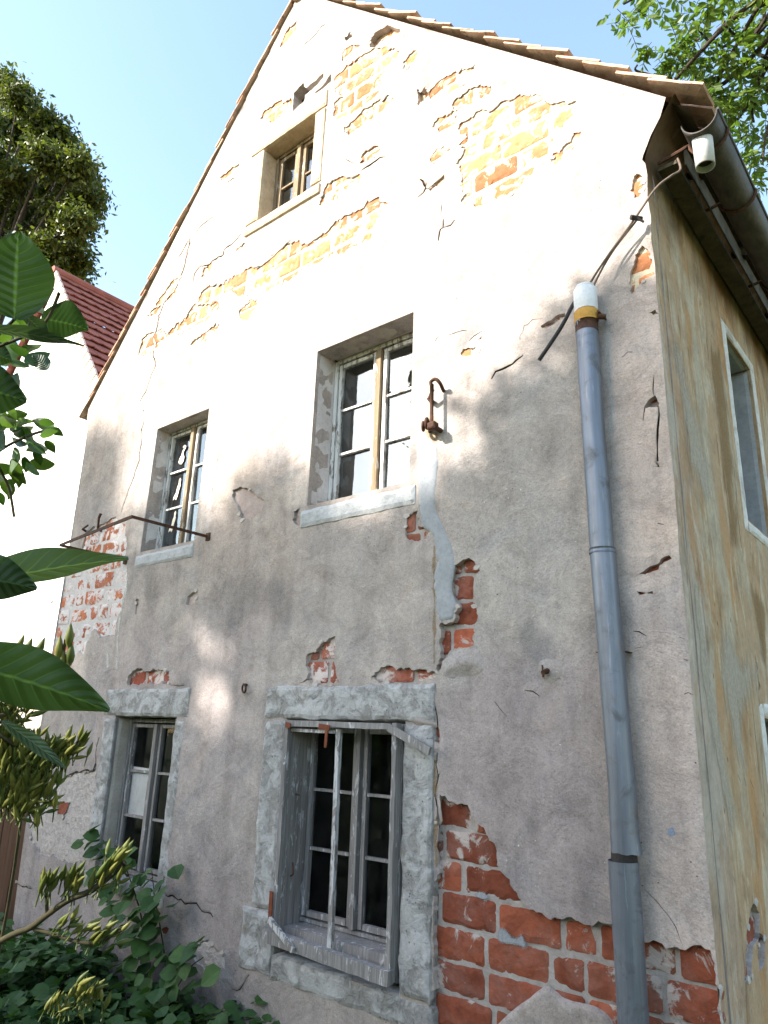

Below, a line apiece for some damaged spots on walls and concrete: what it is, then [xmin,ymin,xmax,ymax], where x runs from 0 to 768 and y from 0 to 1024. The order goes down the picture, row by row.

flaking render [259,25,418,135]
flaking render [417,64,581,207]
flaking render [138,197,388,356]
flaking render [629,246,654,294]
crack [121,176,241,512]
crack [638,378,664,467]
flaking render [51,517,141,667]
flaking render [300,636,339,687]
flaking render [368,558,480,684]
crack [165,891,214,917]
flaking render [429,795,617,1024]
flaking render [645,940,726,1024]